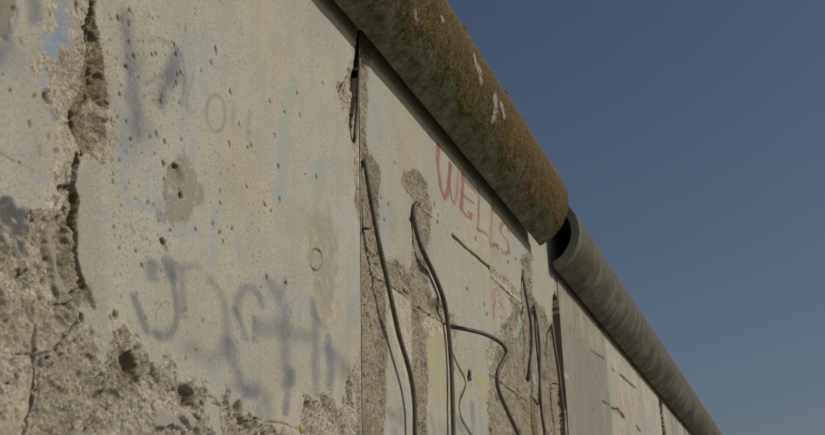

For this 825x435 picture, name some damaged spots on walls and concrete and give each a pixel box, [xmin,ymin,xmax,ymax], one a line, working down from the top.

spalling [0,0,567,435]